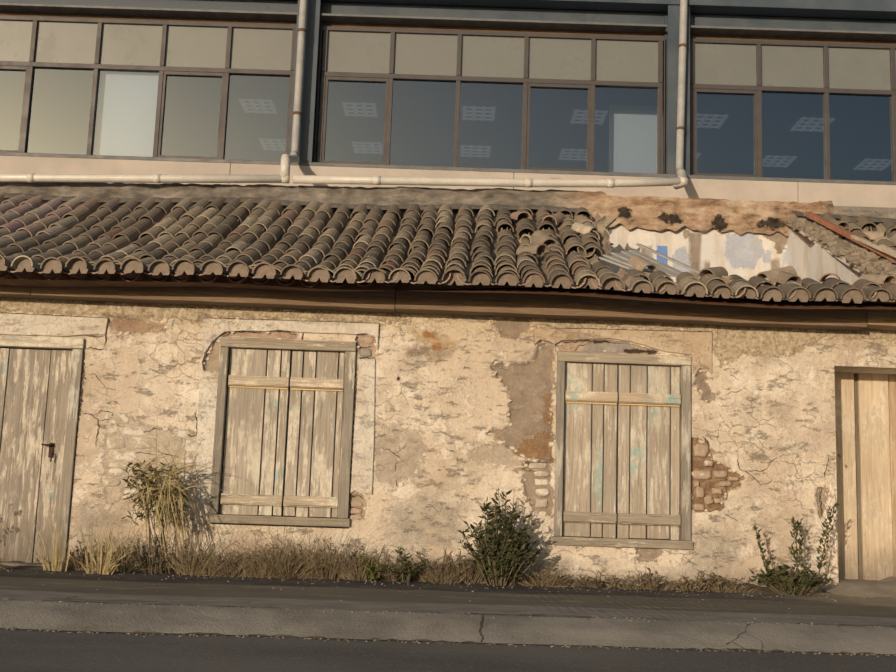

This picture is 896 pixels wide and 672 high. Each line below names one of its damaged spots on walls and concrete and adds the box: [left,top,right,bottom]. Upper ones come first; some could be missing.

flaking render [0,298,403,335]
spalling [203,330,304,373]
spalling [489,316,537,342]
flaking render [555,319,896,367]
spalling [693,370,716,405]
crack [0,312,197,509]
spalling [468,339,664,518]
flaking render [691,437,744,513]
crack [109,629,223,637]
crack [248,632,328,640]
crack [350,612,554,645]
crack [687,622,889,655]